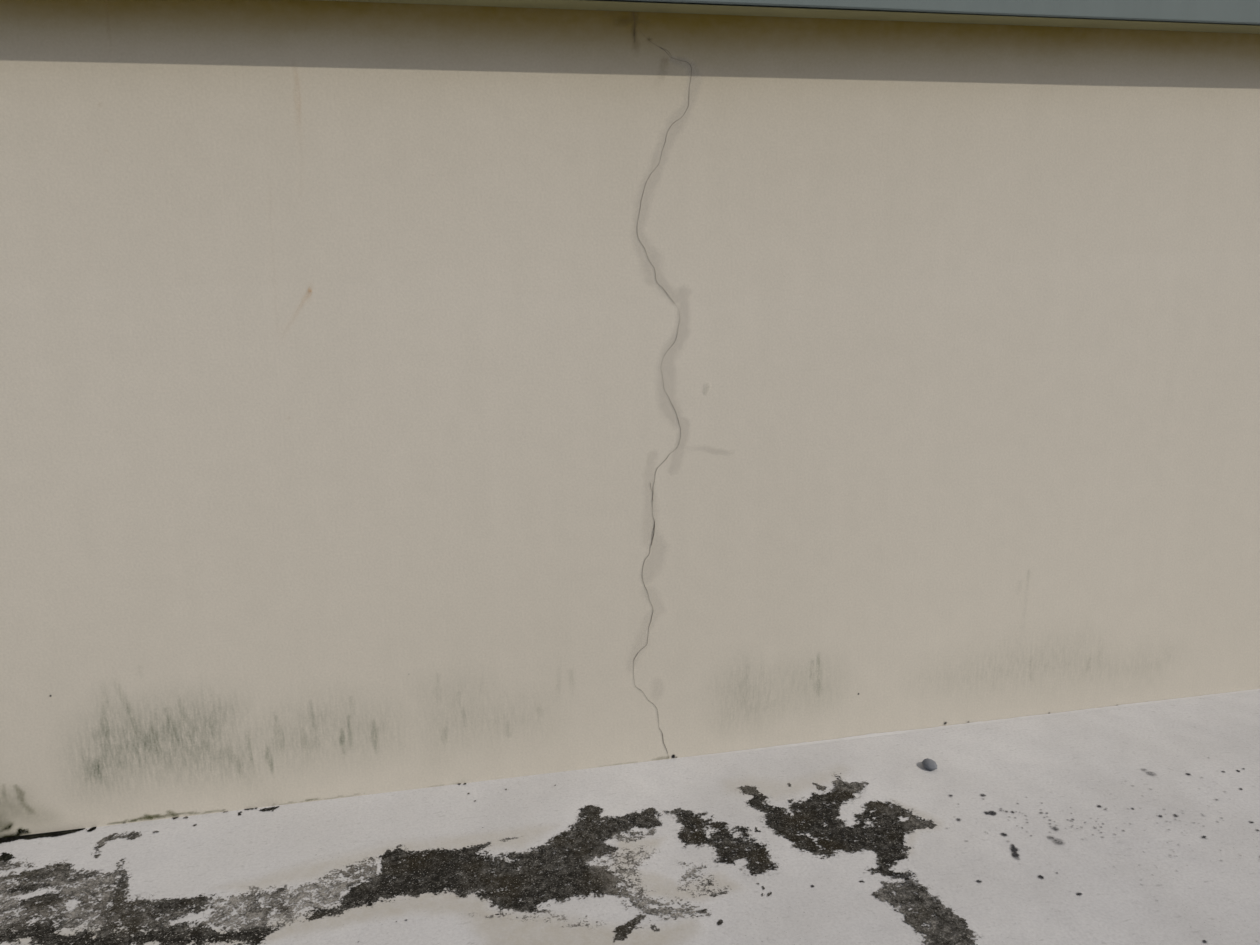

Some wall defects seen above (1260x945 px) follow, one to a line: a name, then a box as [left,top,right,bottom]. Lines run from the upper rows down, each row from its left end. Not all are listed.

damp [44,656,570,816]
peeling [0,773,978,945]